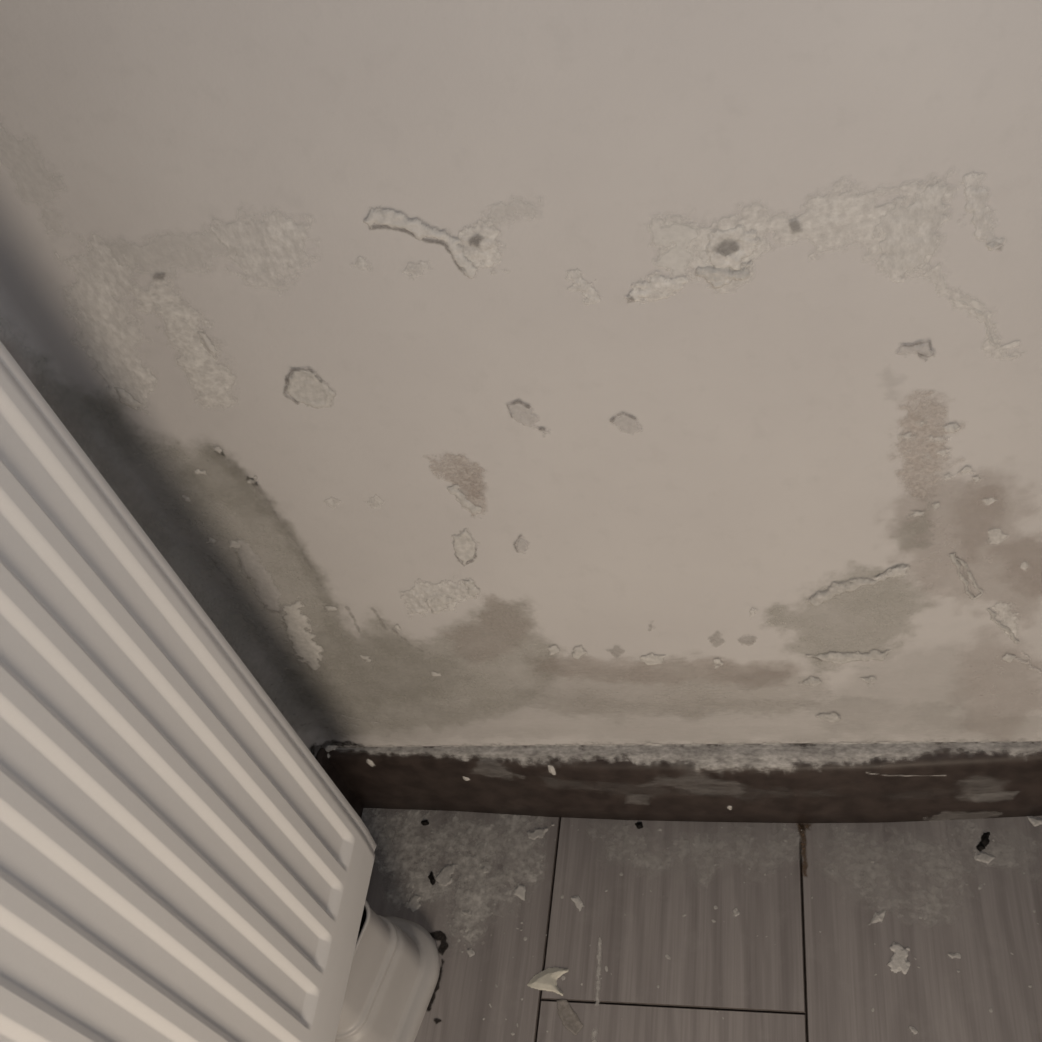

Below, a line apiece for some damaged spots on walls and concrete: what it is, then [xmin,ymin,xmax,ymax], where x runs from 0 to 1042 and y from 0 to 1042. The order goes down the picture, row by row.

damp [227,541,337,670]
damp [310,741,362,757]